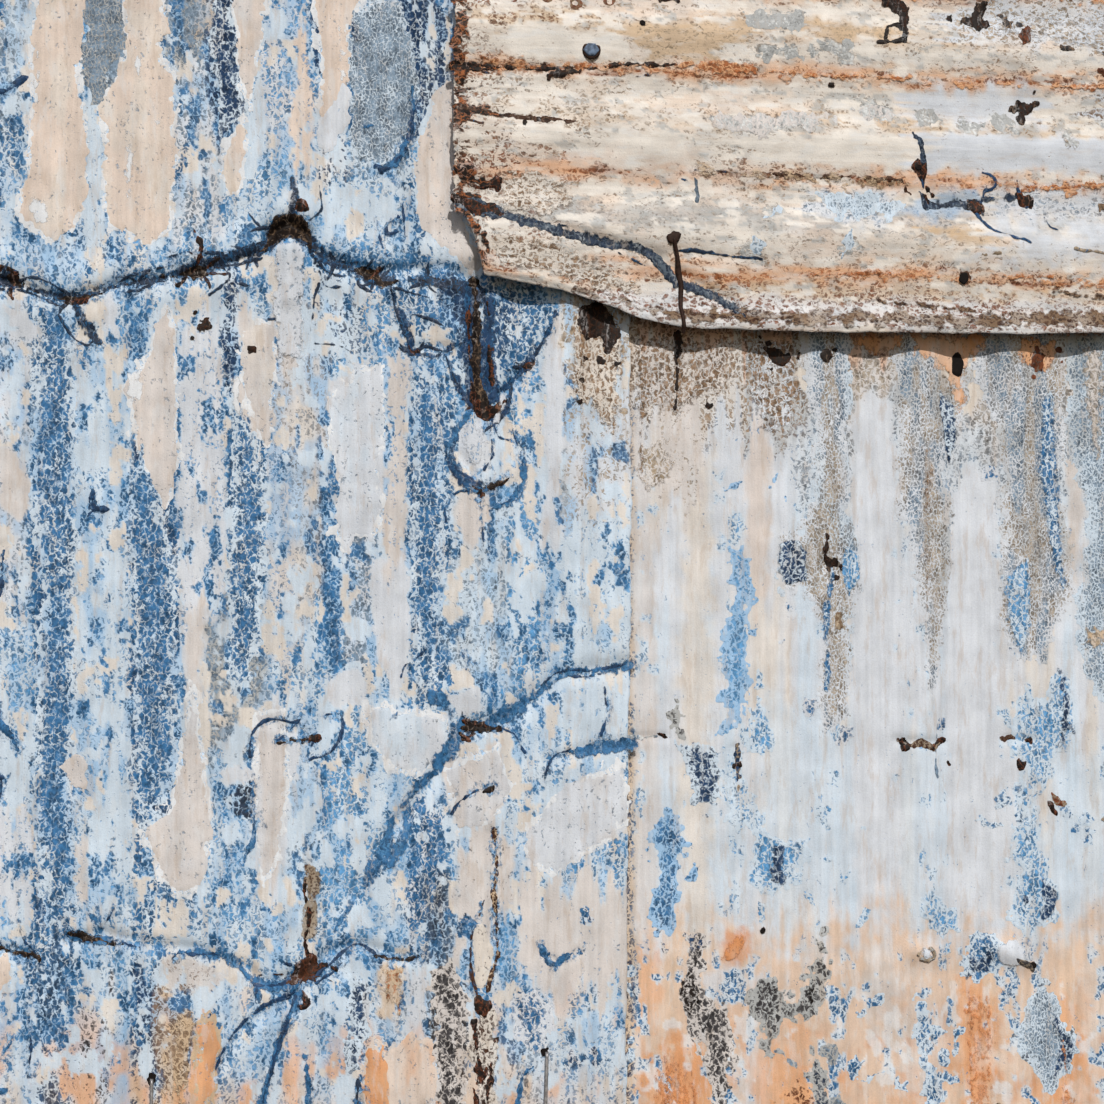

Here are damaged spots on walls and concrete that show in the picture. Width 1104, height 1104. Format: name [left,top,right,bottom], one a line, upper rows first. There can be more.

peeling [13,0,182,246]
peeling [310,0,483,281]
rust [449,0,932,131]
rust [946,1,1031,44]
rust [997,81,1040,125]
rust [453,158,1104,434]
peeling [28,300,88,928]
peeling [774,331,864,746]
peeling [888,332,1104,984]
crack [371,947,425,969]
rust [468,995,499,1104]
peeling [645,545,833,1104]